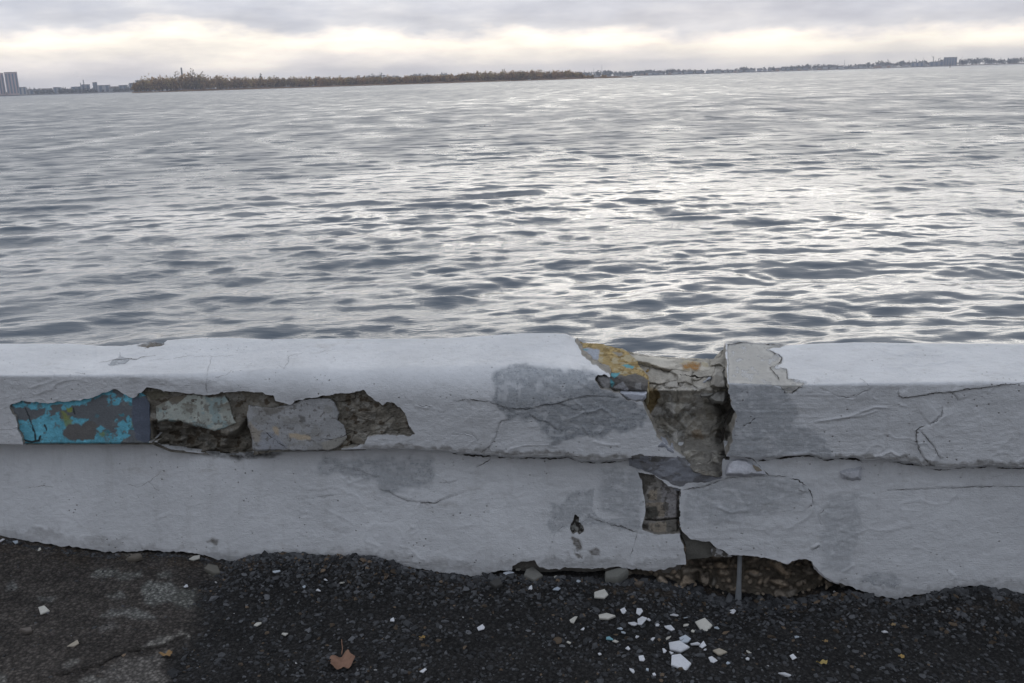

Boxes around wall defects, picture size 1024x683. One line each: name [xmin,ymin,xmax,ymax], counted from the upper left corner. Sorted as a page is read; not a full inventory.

spalling [9,387,415,456]
crack [460,395,618,423]
crack [453,434,627,467]
spalling [575,338,804,556]
crack [677,382,1024,530]
spalling [570,514,584,534]